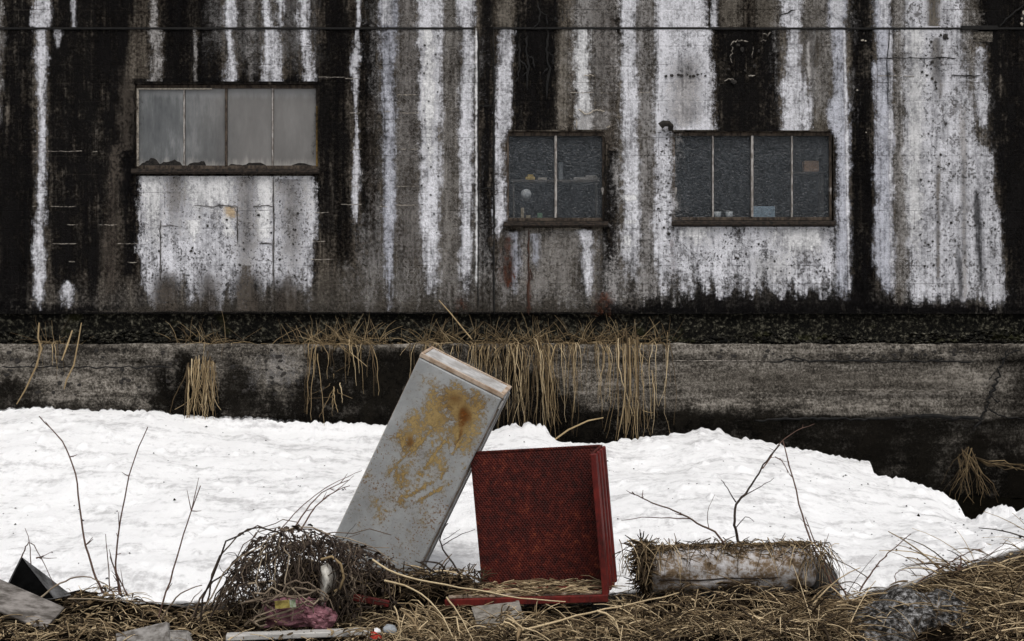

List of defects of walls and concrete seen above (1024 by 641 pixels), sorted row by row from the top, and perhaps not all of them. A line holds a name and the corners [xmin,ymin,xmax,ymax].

damp [0,0,1024,314]
damp [0,345,426,425]
damp [444,345,1024,498]
crack [755,349,1024,432]